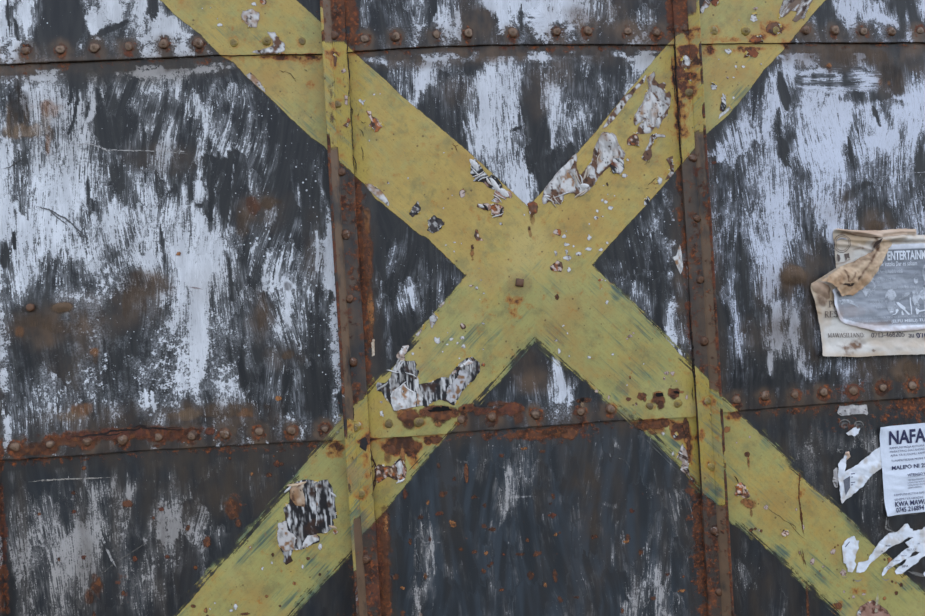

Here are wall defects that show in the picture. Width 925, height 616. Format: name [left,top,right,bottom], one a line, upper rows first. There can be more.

peeling [241,0,267,29]
peeling [253,31,285,55]
peeling [469,158,512,225]
peeling [524,71,672,272]
peeling [656,156,675,185]
rust [362,211,374,346]
peeling [376,301,485,417]
rust [17,426,215,455]
peeling [372,458,407,483]
rust [384,401,530,466]
rust [626,388,690,454]
peeling [261,479,339,570]